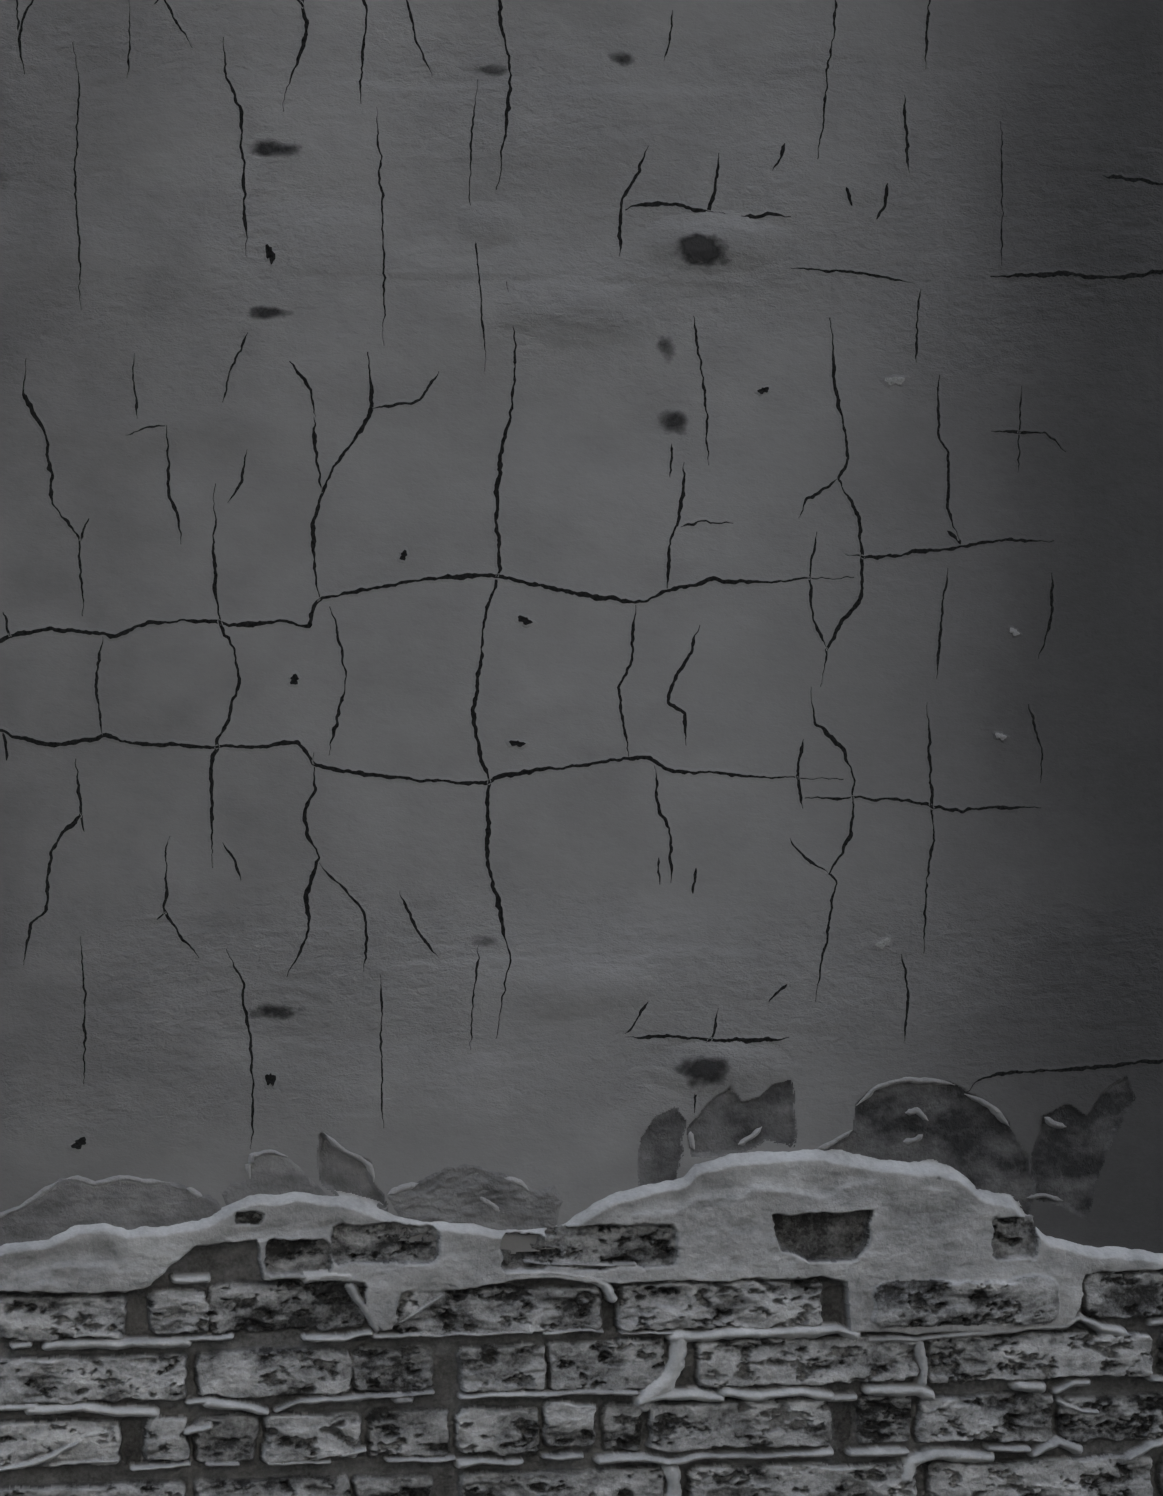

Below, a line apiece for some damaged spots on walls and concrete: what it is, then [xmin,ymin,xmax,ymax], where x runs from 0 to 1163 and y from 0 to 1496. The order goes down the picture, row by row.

crack [0,0,1067,1149]
peeling [0,1132,563,1246]
peeling [638,1080,798,1186]
peeling [817,1076,1136,1221]